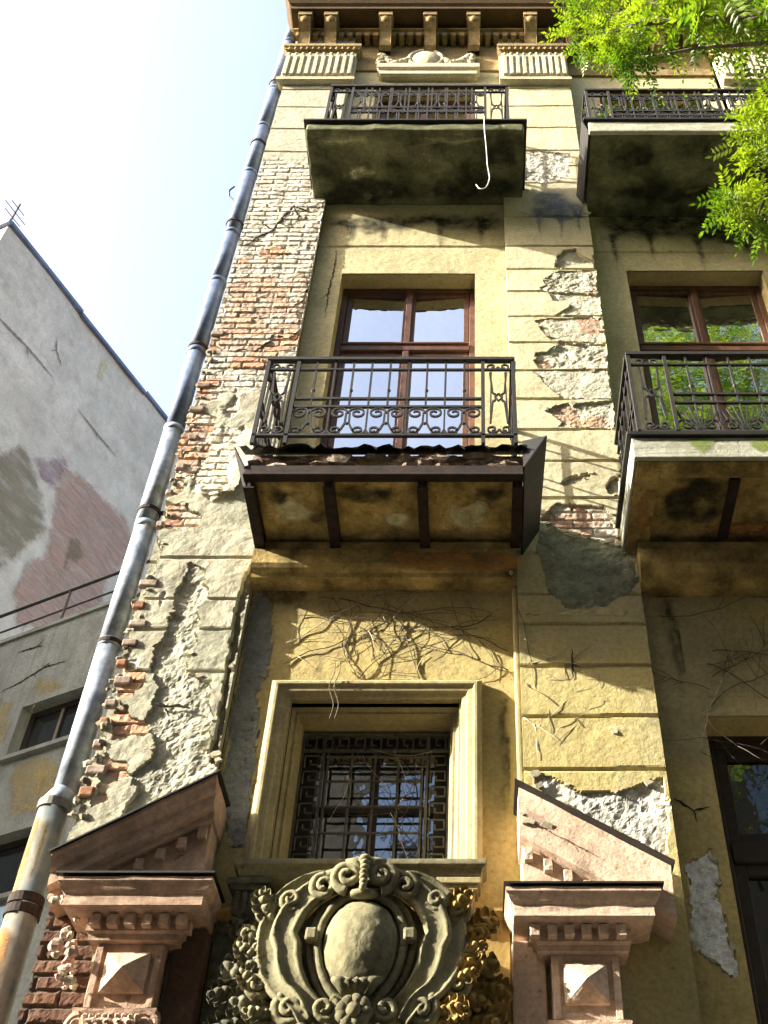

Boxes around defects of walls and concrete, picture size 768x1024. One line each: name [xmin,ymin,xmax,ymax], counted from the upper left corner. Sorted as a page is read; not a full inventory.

mould [487,135,515,164]
leakage [324,169,410,203]
mould [434,177,513,200]
crack [242,206,318,246]
leakage [332,215,497,244]
leakage [605,216,755,259]
crack [322,252,336,311]
spalling [533,250,615,430]
flaking render [156,273,308,549]
flaking render [15,458,131,628]
spalling [67,564,274,849]
spalling [530,770,672,854]